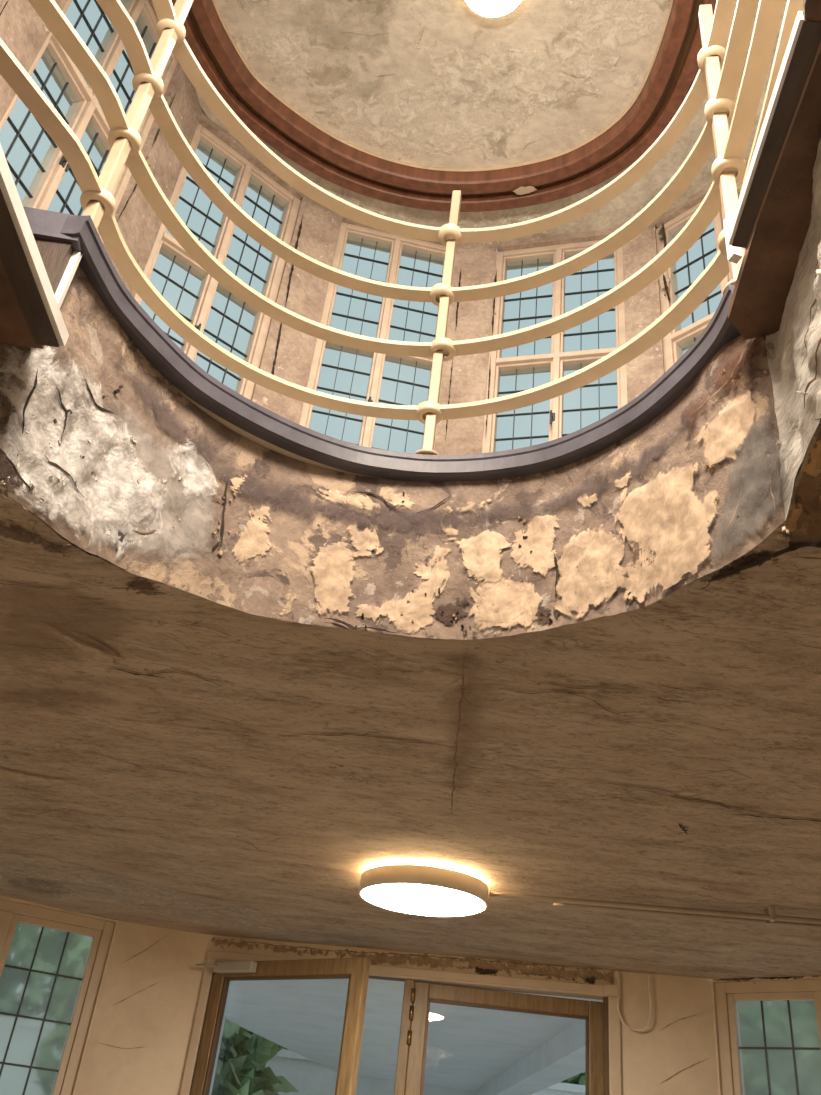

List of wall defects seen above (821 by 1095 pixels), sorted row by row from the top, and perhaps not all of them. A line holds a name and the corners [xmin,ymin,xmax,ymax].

efflorescence [0,346,217,558]
peeling [230,475,247,493]
peeling [232,506,272,565]
peeling [310,390,755,634]
peeling [782,502,803,533]
peeling [280,589,296,615]
crack [282,652,479,819]
peeling [209,936,614,984]